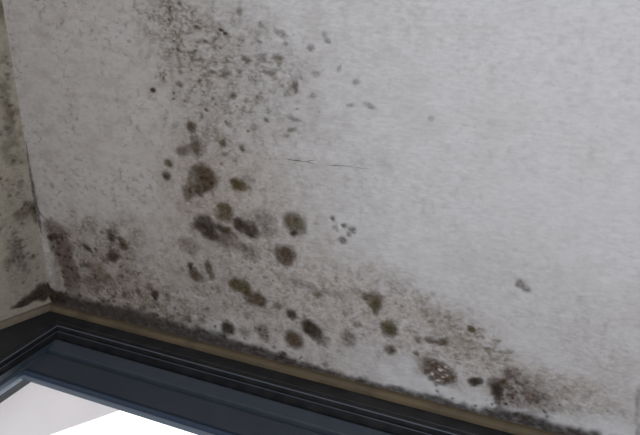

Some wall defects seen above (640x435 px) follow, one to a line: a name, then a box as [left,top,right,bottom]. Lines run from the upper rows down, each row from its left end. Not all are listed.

water stain [159,0,206,73]
water stain [184,165,267,247]
water stain [285,215,304,235]
water stain [14,221,599,435]